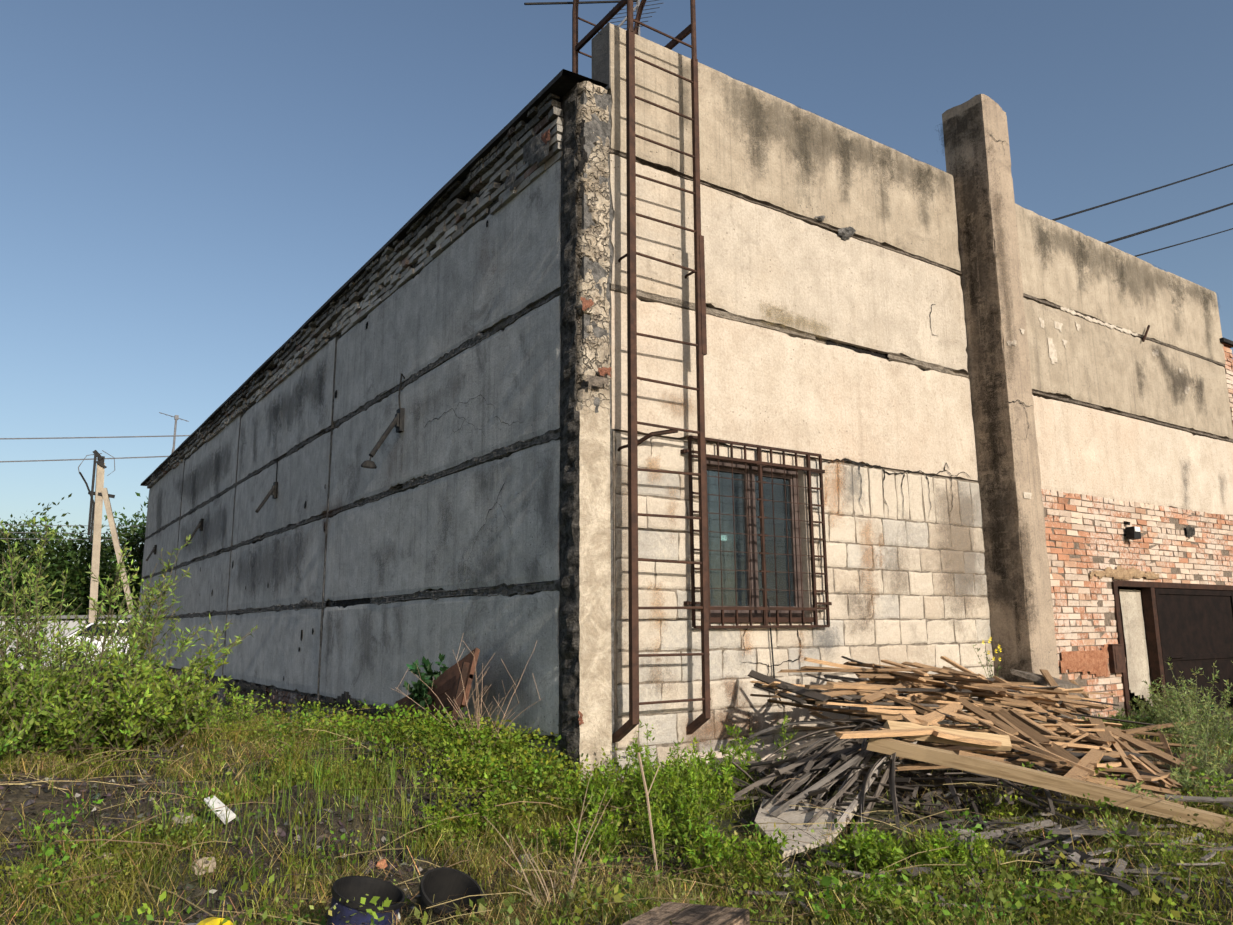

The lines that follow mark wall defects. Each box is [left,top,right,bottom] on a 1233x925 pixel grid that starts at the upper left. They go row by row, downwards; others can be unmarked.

water stain [941,103,982,155]
spalling [578,119,588,199]
peeling [1039,317,1081,364]
water stain [1061,307,1138,336]